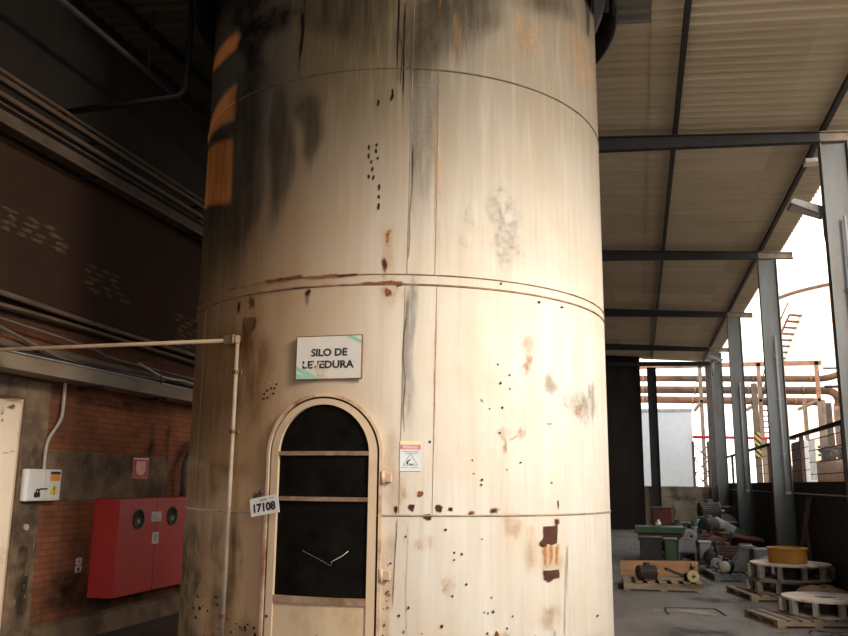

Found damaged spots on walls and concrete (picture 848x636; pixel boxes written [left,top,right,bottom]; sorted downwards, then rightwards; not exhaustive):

damp [203,0,578,292]
rust [186,225,406,509]
damp [401,261,419,435]
damp [12,505,256,636]
rust [490,506,565,575]